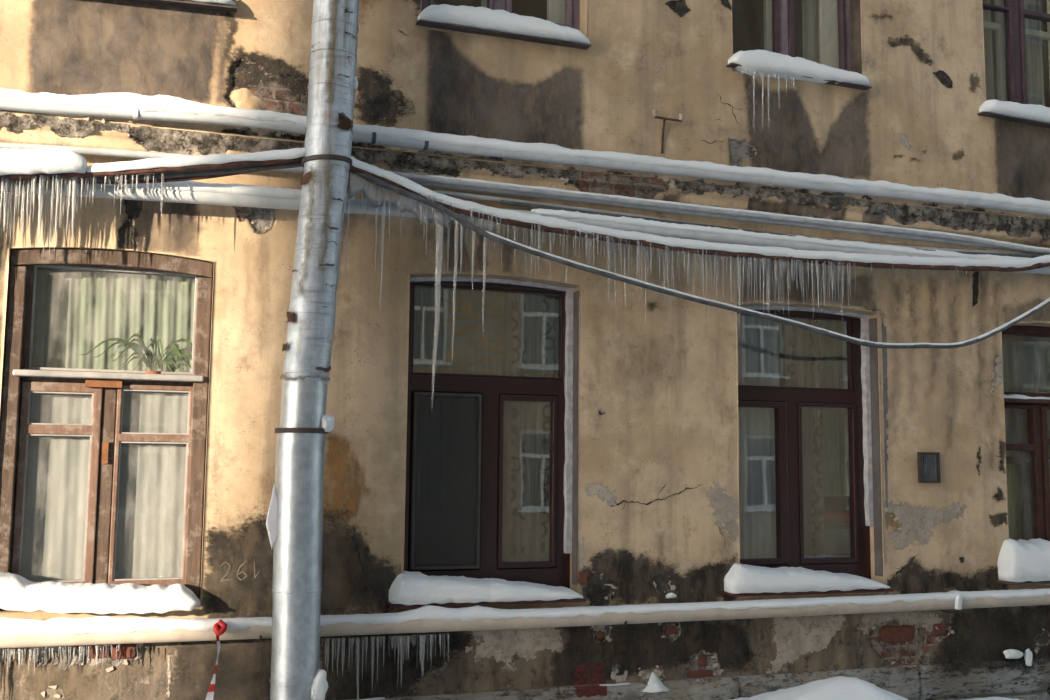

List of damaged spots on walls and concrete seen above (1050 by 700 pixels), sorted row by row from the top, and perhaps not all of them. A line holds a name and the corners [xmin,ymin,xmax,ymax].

spalling [665,0,691,17]
flaking render [224,57,309,116]
crack [611,481,703,510]
peeling [883,500,967,563]
damp [202,514,273,619]
damp [320,510,401,615]
damp [886,557,1007,594]
peeling [766,614,846,673]
flaking render [856,611,954,672]